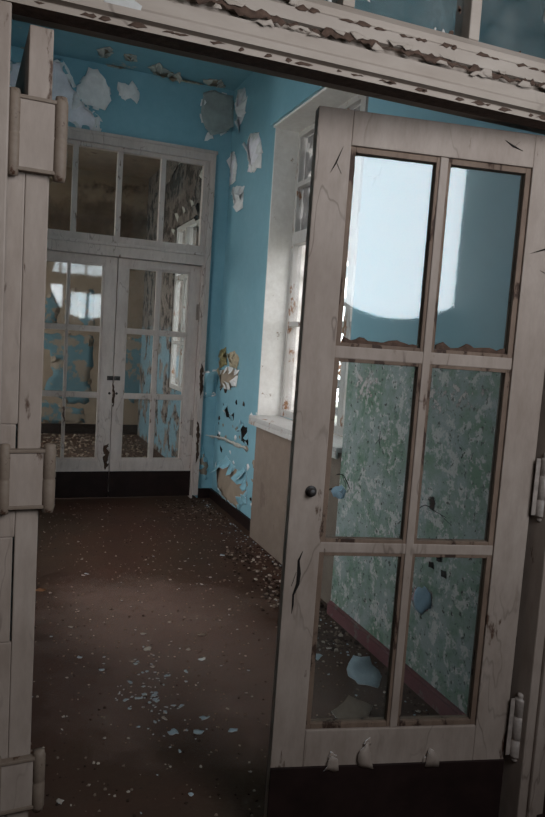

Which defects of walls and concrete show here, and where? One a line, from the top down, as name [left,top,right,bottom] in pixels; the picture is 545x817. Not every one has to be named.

peeling [98,0,142,10]
peeling [10,60,21,87]
peeling [52,47,140,132]
peeling [148,63,248,141]
peeling [186,0,545,90]
peeling [227,152,245,212]
peeling [242,132,263,173]
peeling [199,347,239,398]
peeling [195,400,257,510]
crack [291,551,303,614]